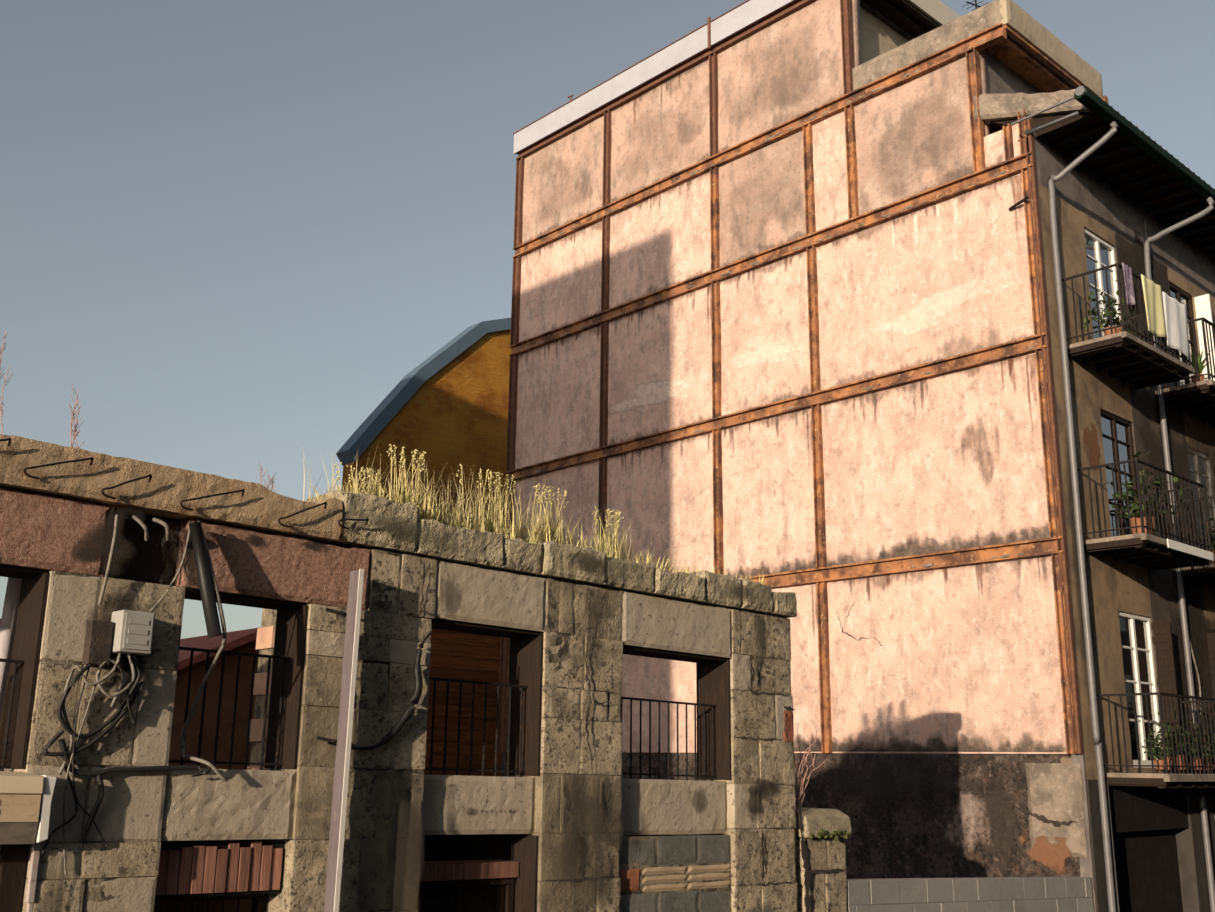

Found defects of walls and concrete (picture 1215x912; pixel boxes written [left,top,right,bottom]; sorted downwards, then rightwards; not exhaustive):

water stain [877,528,1049,560]
water stain [728,554,852,578]
water stain [794,735,1063,820]
water stain [747,778,775,821]
spalling [944,763,1088,873]